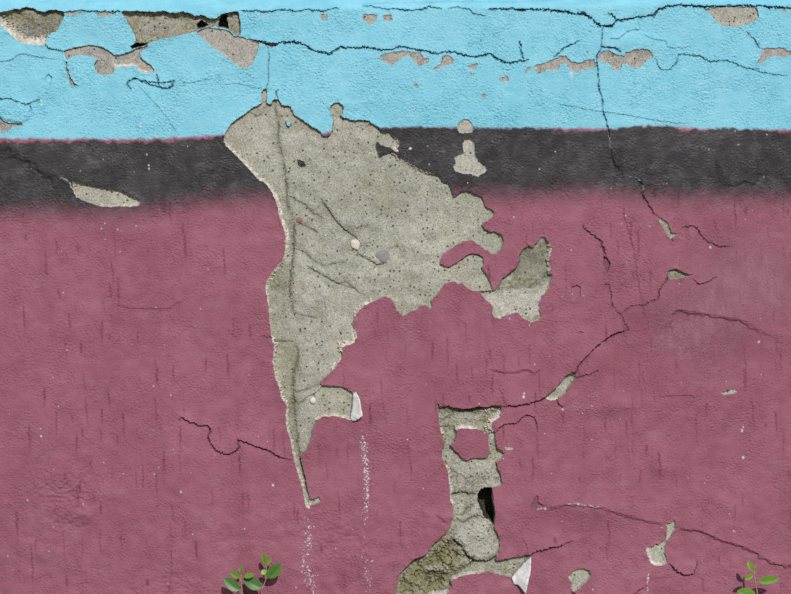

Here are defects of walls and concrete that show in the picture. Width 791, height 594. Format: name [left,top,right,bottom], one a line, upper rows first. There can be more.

flaking render [0,7,85,45]
crack [63,7,121,15]
flaking render [63,10,259,75]
crack [239,6,339,14]
crack [126,40,529,133]
peeling [525,48,654,74]
flaking render [72,180,141,207]
crack [361,0,791,379]
flaking render [224,89,553,509]
crack [178,417,291,461]
flaking render [396,404,531,594]
crack [543,503,791,569]